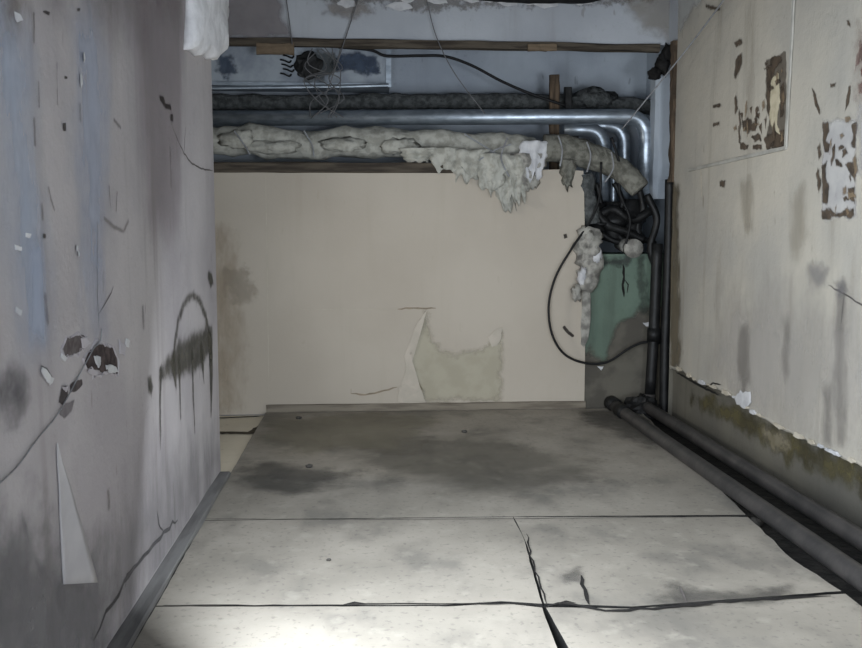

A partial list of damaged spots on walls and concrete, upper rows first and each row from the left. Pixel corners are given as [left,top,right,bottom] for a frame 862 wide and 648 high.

peeling [330,0,558,15]
spalling [41,331,130,418]
water stain [690,395,862,498]